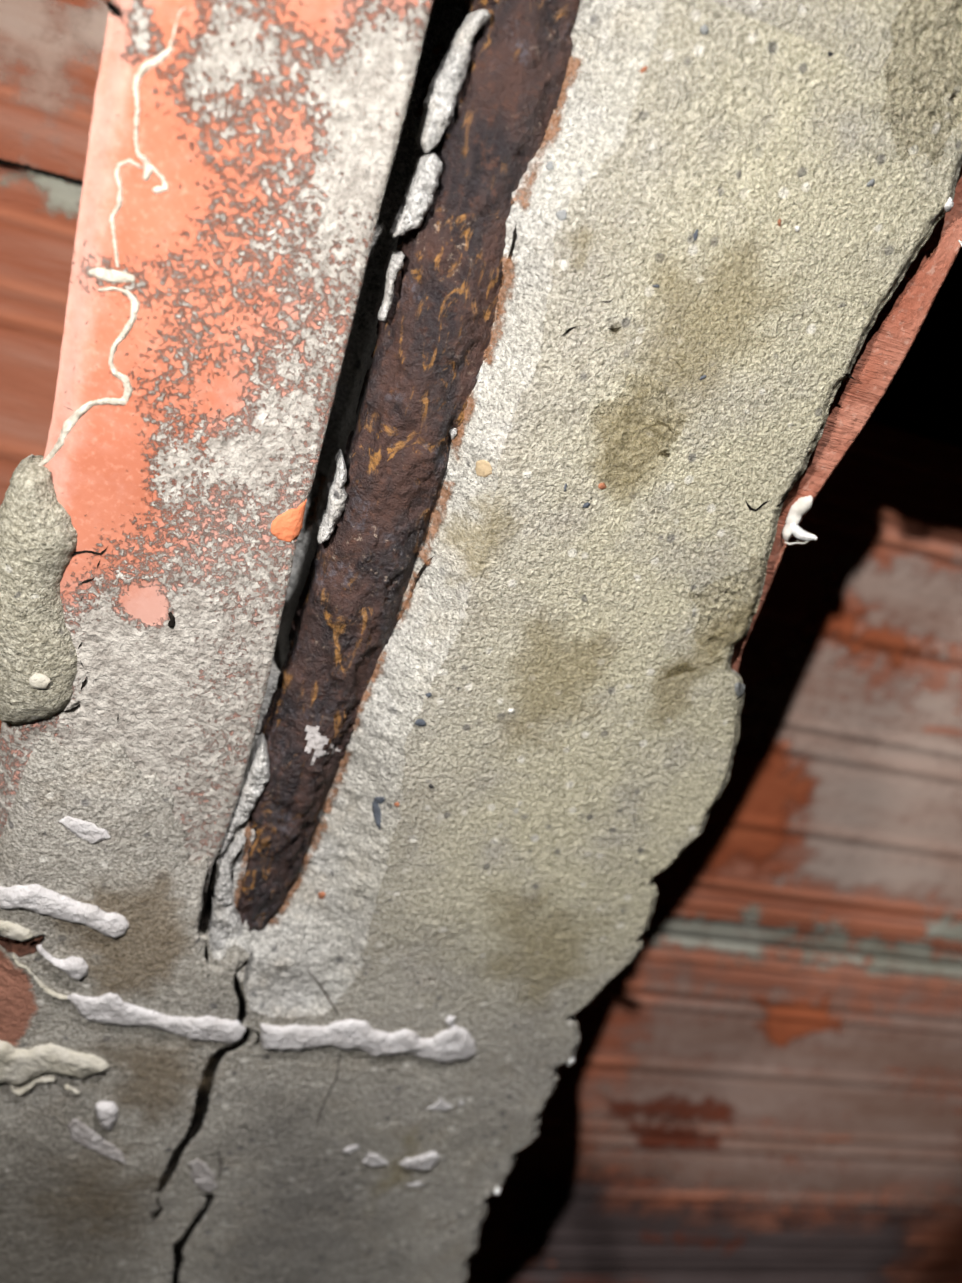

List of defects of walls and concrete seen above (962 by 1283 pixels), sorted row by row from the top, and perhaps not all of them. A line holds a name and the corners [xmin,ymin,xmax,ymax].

rust [415,77,431,120]
rust [511,56,581,209]
rust [484,257,515,365]
rust [451,393,475,460]
spalling [590,374,687,488]
rust [307,473,327,530]
rust [397,481,455,620]
spalling [207,0,664,1018]
rust [352,651,387,730]
rust [269,751,352,924]
crack [150,846,260,1283]